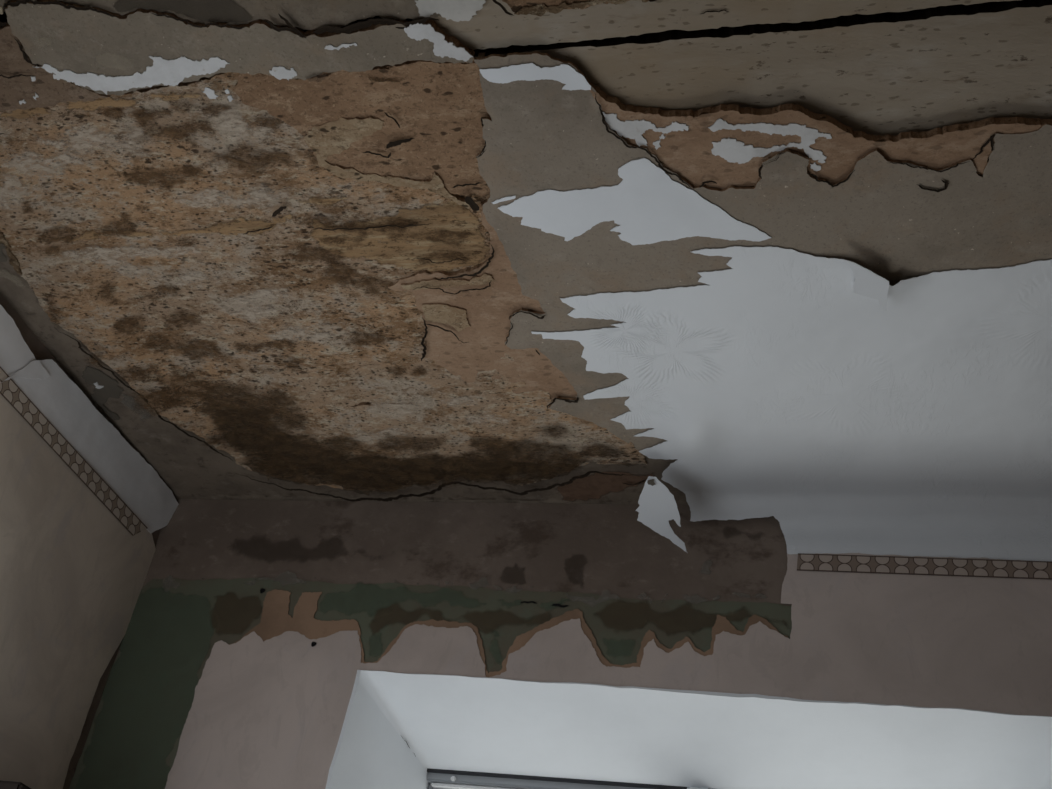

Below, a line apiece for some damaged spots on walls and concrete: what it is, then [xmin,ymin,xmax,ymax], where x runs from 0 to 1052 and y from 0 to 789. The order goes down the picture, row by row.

crack [0,0,123,79]
crack [150,12,438,38]
spalling [502,0,629,16]
spalling [589,81,1052,189]
spalling [0,0,577,416]
water stain [37,227,199,277]
water stain [82,310,643,495]
water stain [211,593,262,634]
water stain [370,604,450,634]
water stain [464,610,550,633]
water stain [596,601,750,634]